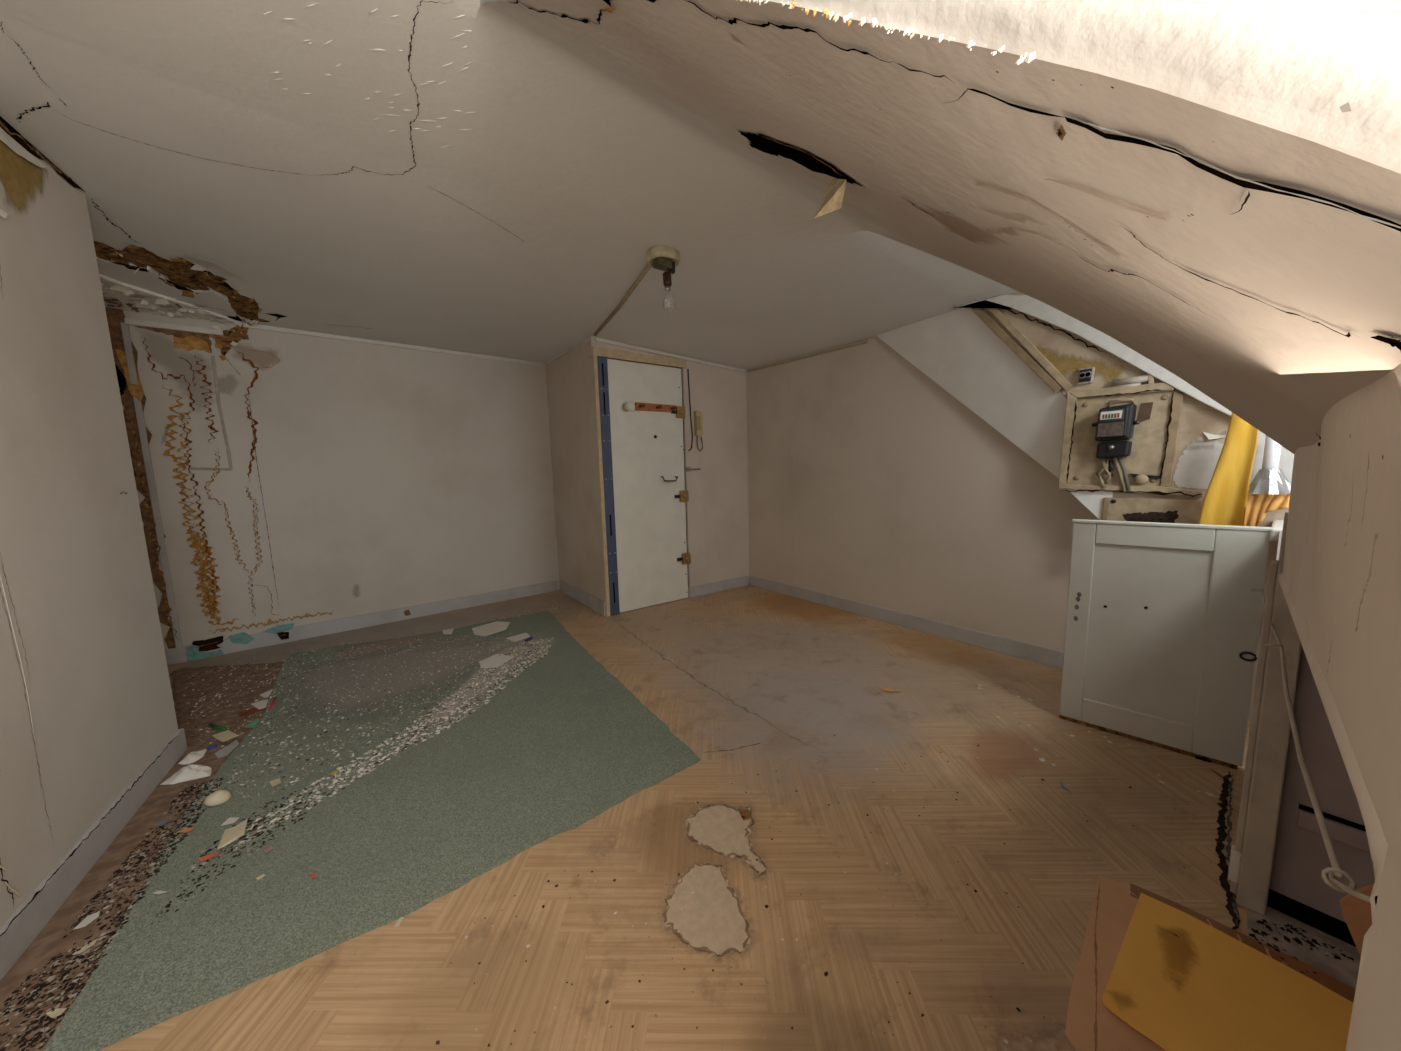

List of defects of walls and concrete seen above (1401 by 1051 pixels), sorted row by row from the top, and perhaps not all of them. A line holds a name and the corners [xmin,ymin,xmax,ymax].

crack [0,1,525,244]
flaking render [736,0,1005,56]
flaking render [1016,51,1036,65]
crack [685,0,1401,232]
flaking render [94,241,270,361]
crack [1080,226,1352,338]
peeling [0,623,295,1051]